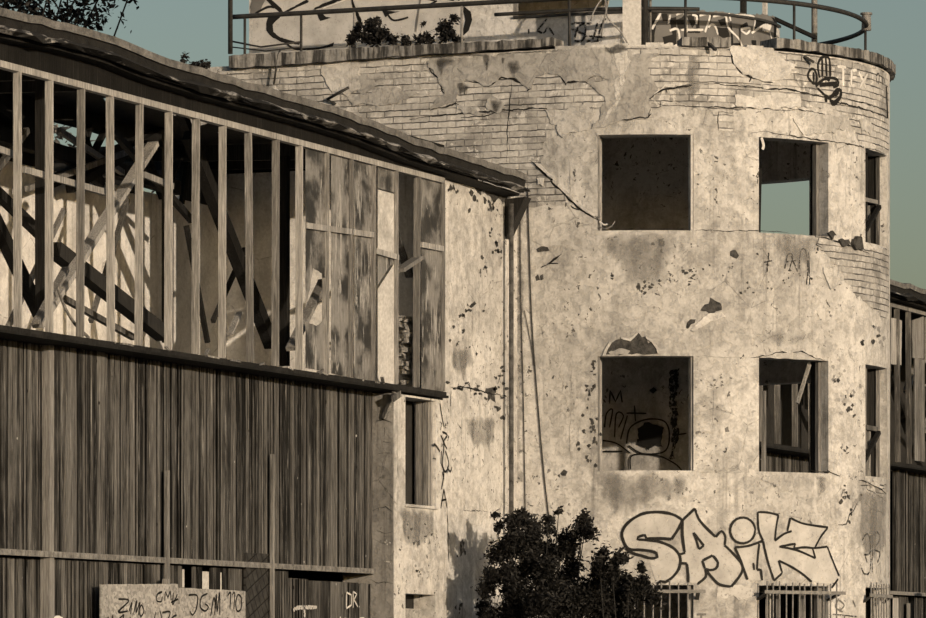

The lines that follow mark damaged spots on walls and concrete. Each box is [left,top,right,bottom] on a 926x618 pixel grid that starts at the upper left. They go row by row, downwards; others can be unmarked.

crack [410,68,547,162]
peeling [222,47,889,208]
crack [622,55,886,130]
crack [753,131,880,152]
spalling [448,181,507,213]
crack [531,161,598,220]
spalling [686,298,726,332]
peeling [809,230,889,347]
spalling [576,332,658,468]
peeling [828,384,862,420]